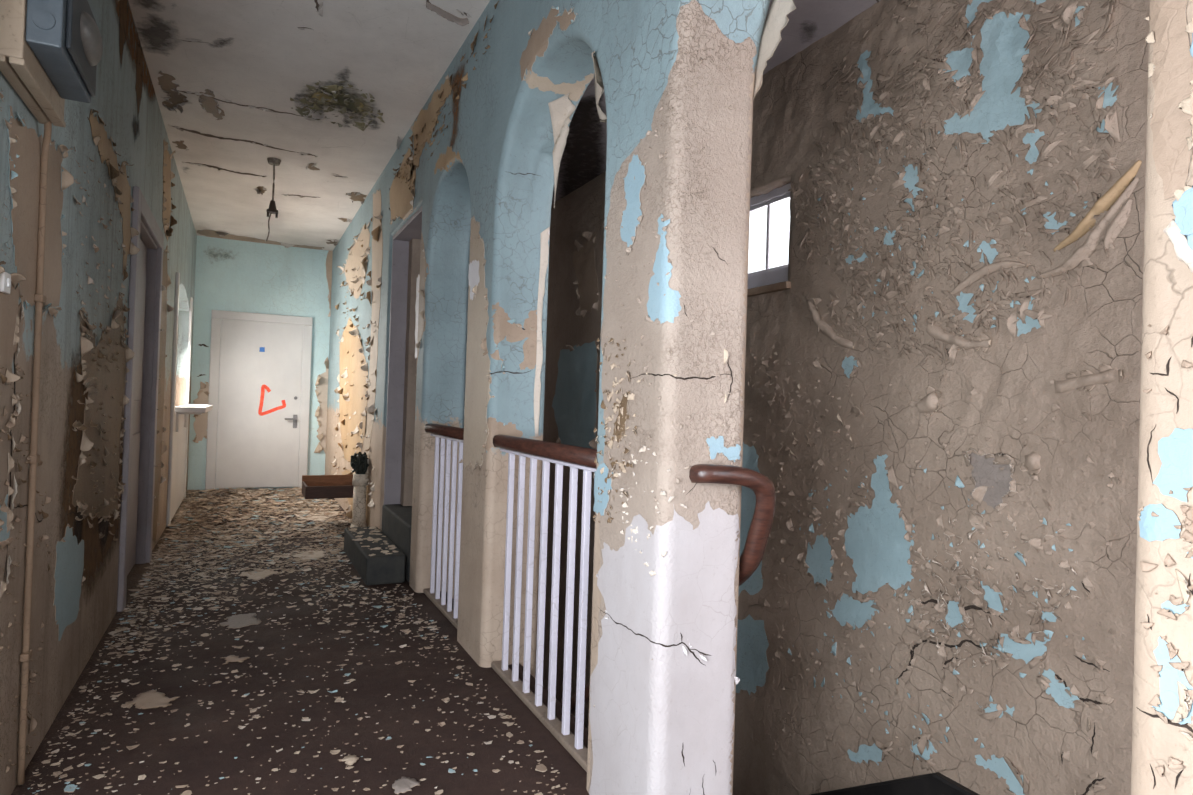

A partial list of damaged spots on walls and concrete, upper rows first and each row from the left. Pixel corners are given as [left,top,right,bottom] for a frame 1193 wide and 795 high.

peeling [158,70,225,120]
leakage [303,74,375,127]
peeling [1144,0,1193,272]
peeling [197,1,499,526]
peeling [0,89,140,652]
crack [630,349,733,403]
peeling [459,0,1122,795]
crack [1147,337,1193,484]
crack [602,611,712,666]
crack [1055,649,1193,795]
peeling [1140,580,1193,725]
crack [1175,542,1193,604]